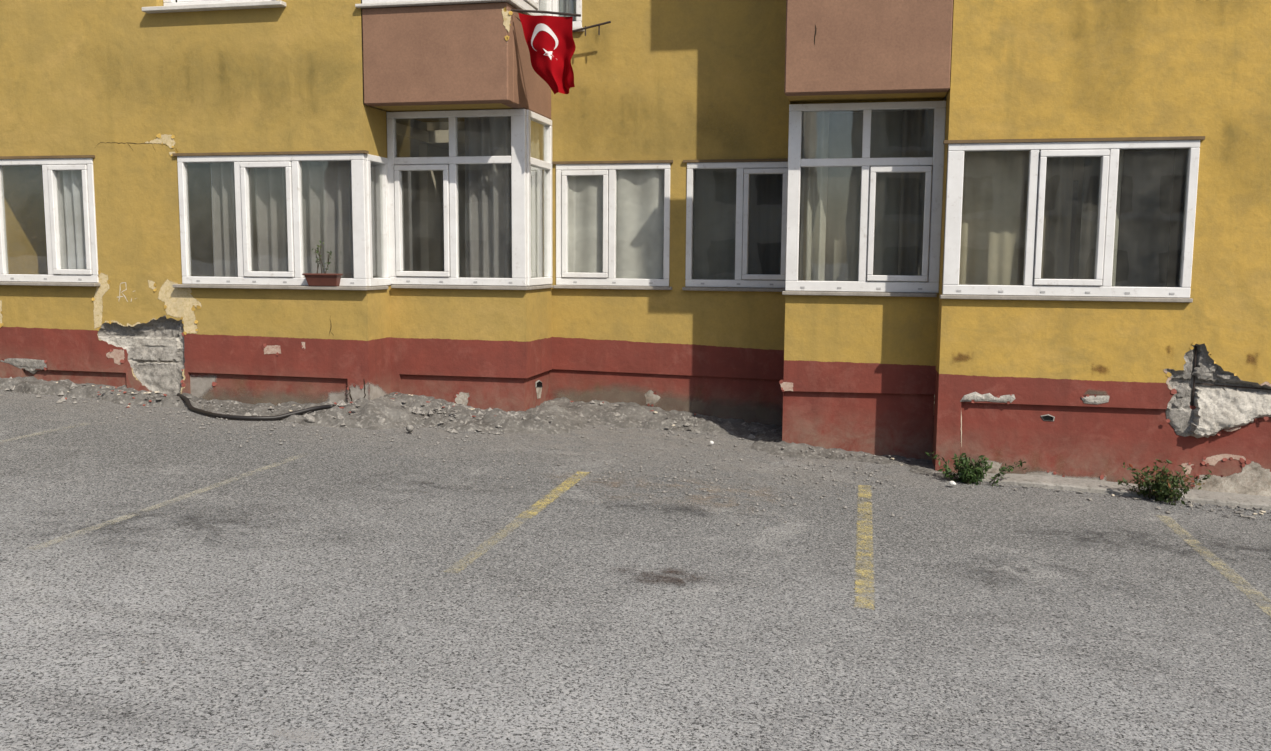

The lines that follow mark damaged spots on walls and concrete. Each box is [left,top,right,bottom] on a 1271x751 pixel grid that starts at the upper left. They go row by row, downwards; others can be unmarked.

spalling [92,271,201,395]
spalling [960,392,1016,404]
spalling [1081,390,1110,404]
spalling [1163,342,1271,438]
peeling [1181,454,1271,496]